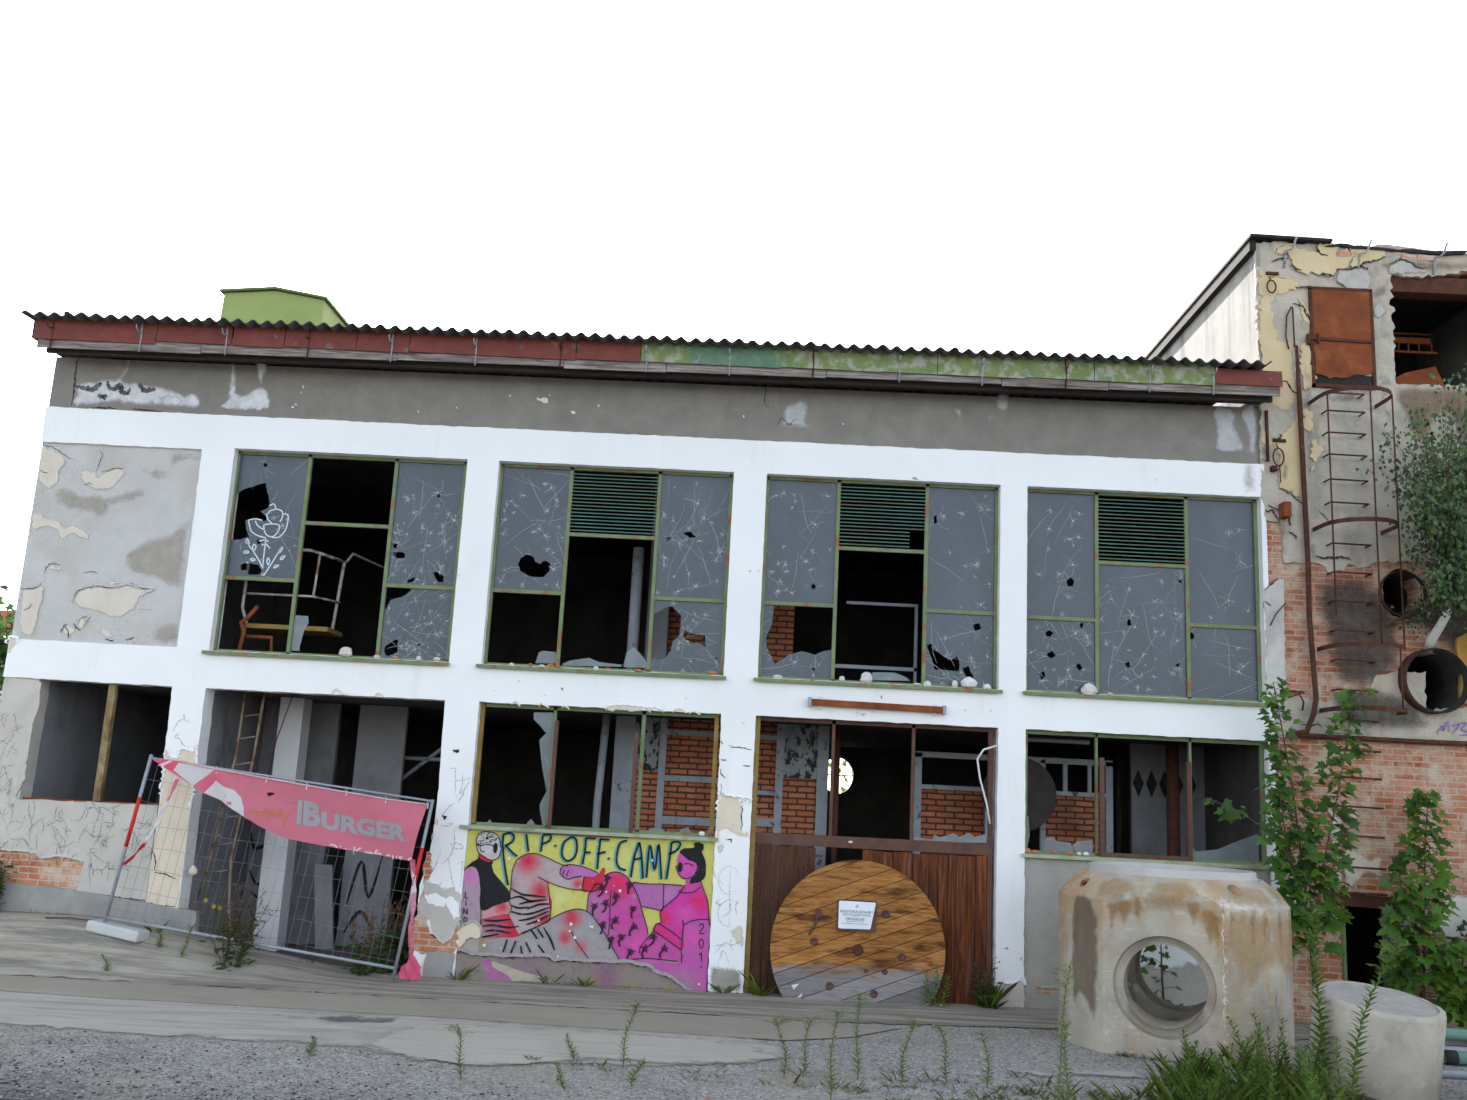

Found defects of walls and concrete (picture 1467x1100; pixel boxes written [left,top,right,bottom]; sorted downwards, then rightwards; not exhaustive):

peeling [1256,243,1386,502]
flaking render [39,448,65,489]
flaking render [81,469,124,489]
flaking render [32,514,88,539]
flaking render [4,566,61,653]
flaking render [63,582,155,637]
flaking render [0,846,85,889]
crack [107,849,176,907]
peeling [413,819,501,954]